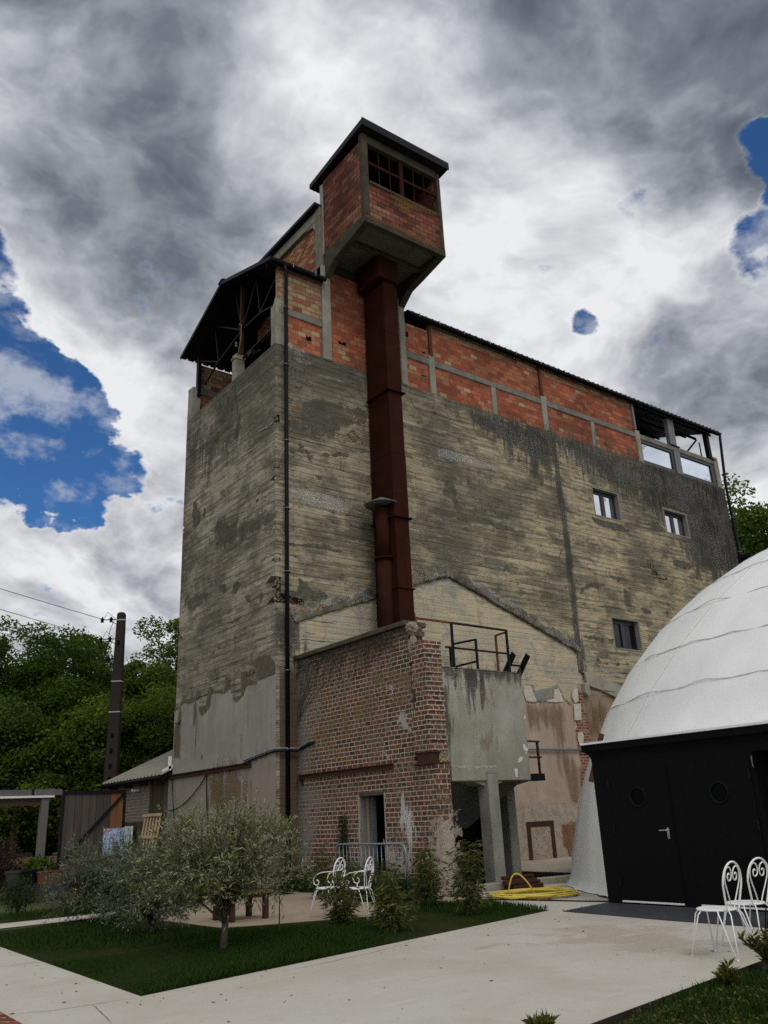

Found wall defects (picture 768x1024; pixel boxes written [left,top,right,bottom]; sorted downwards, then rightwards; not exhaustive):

peeling [219,576,328,605]
damp [471,407,742,675]
flaking render [170,655,276,889]
damp [444,660,521,746]
flaking render [514,684,591,879]